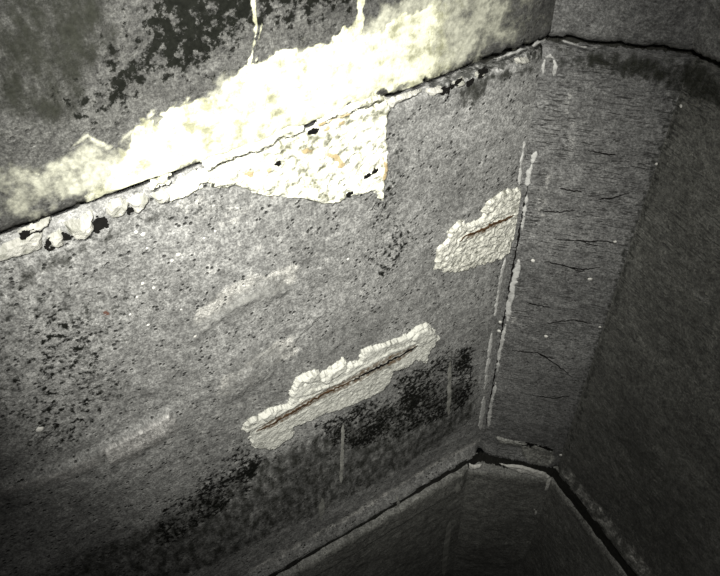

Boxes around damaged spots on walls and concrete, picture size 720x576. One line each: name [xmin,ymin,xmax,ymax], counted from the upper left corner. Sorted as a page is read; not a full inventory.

water stain [0,0,521,279]
peeling [105,188,170,218]
peeling [0,210,94,261]
crack [545,261,600,272]
crack [557,238,614,246]
crack [484,186,574,436]
crack [527,302,592,324]
water stain [20,305,111,442]
water stain [71,322,476,576]